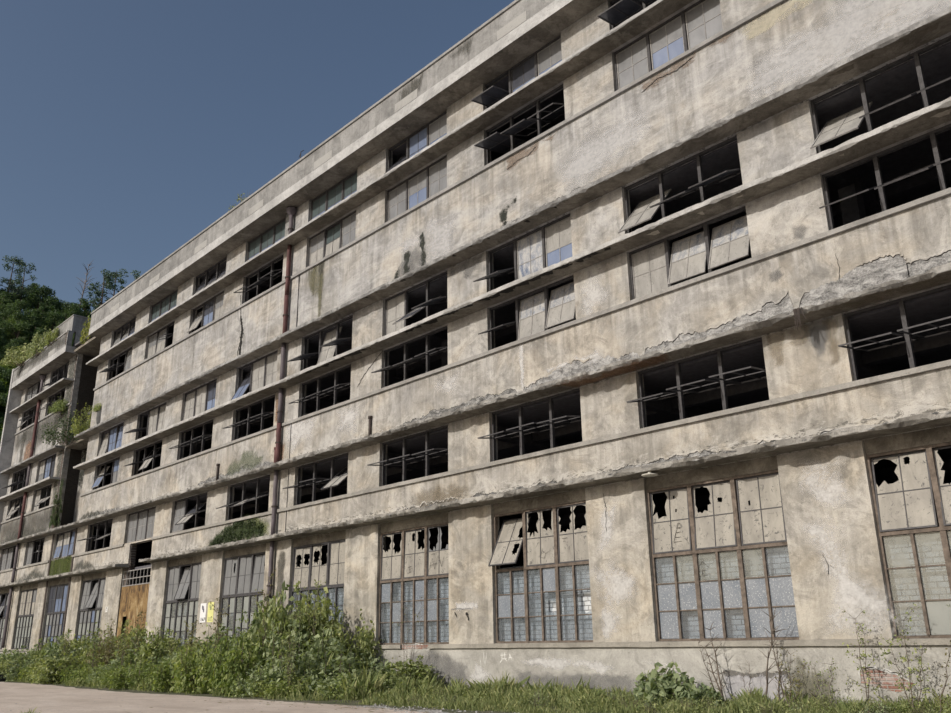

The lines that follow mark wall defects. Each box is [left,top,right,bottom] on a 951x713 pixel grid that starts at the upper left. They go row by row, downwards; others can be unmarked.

damp [394,224,450,279]
damp [309,262,324,317]
crack [236,295,244,355]
spalling [389,246,951,431]
peeling [305,342,378,374]
spalling [750,422,891,446]
spalling [586,447,738,480]
spalling [402,486,523,511]
flaking render [858,666,916,694]